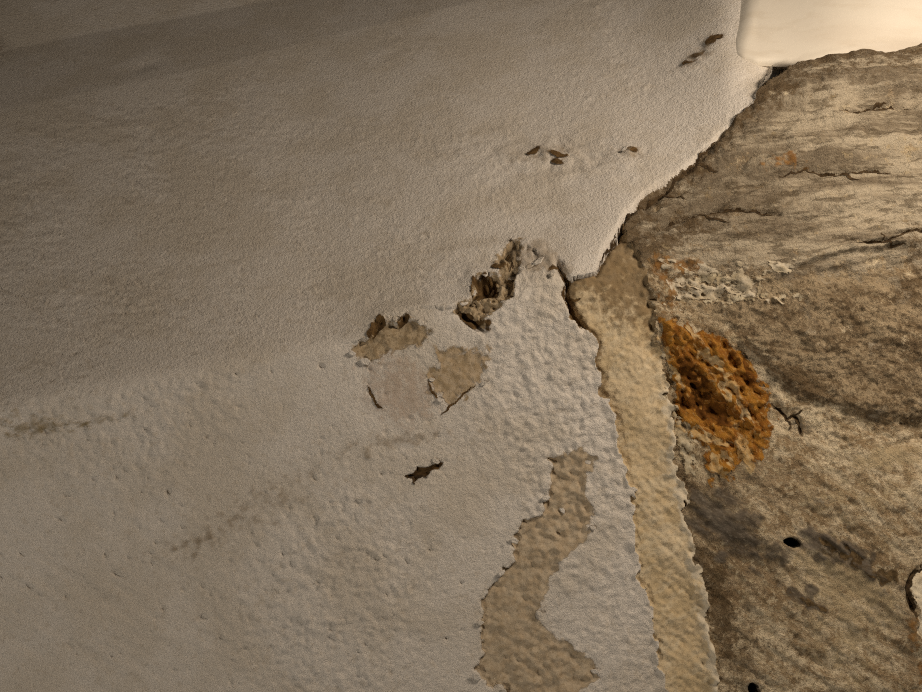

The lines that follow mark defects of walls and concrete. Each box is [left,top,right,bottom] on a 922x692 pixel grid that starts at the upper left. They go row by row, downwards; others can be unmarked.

spalling [682,34,723,65]
spalling [453,237,544,331]
corrosion [654,254,701,306]
peeling [348,312,492,415]
corrosion [656,317,779,488]
spalling [404,458,443,485]
peeling [472,447,599,692]